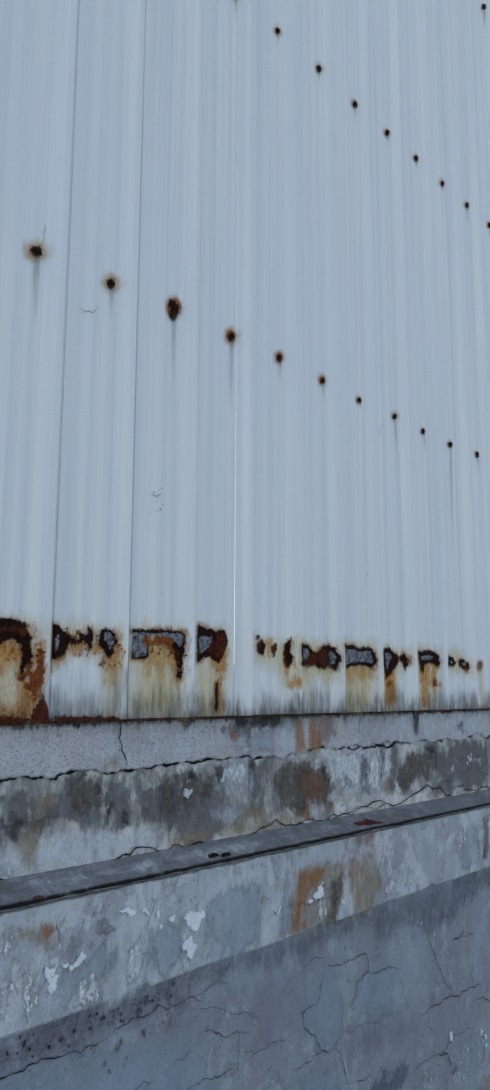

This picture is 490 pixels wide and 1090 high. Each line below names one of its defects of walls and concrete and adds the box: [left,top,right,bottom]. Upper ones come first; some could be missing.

rust [29,227,46,258]
rust [168,298,181,322]
rust [0,617,228,726]
rust [256,635,483,706]
crack [0,716,490,860]
water stain [0,710,490,878]
rust [292,856,380,929]
peeling [0,946,175,1060]
water stain [70,937,149,1012]
peeling [119,906,205,986]
crack [0,872,490,1090]